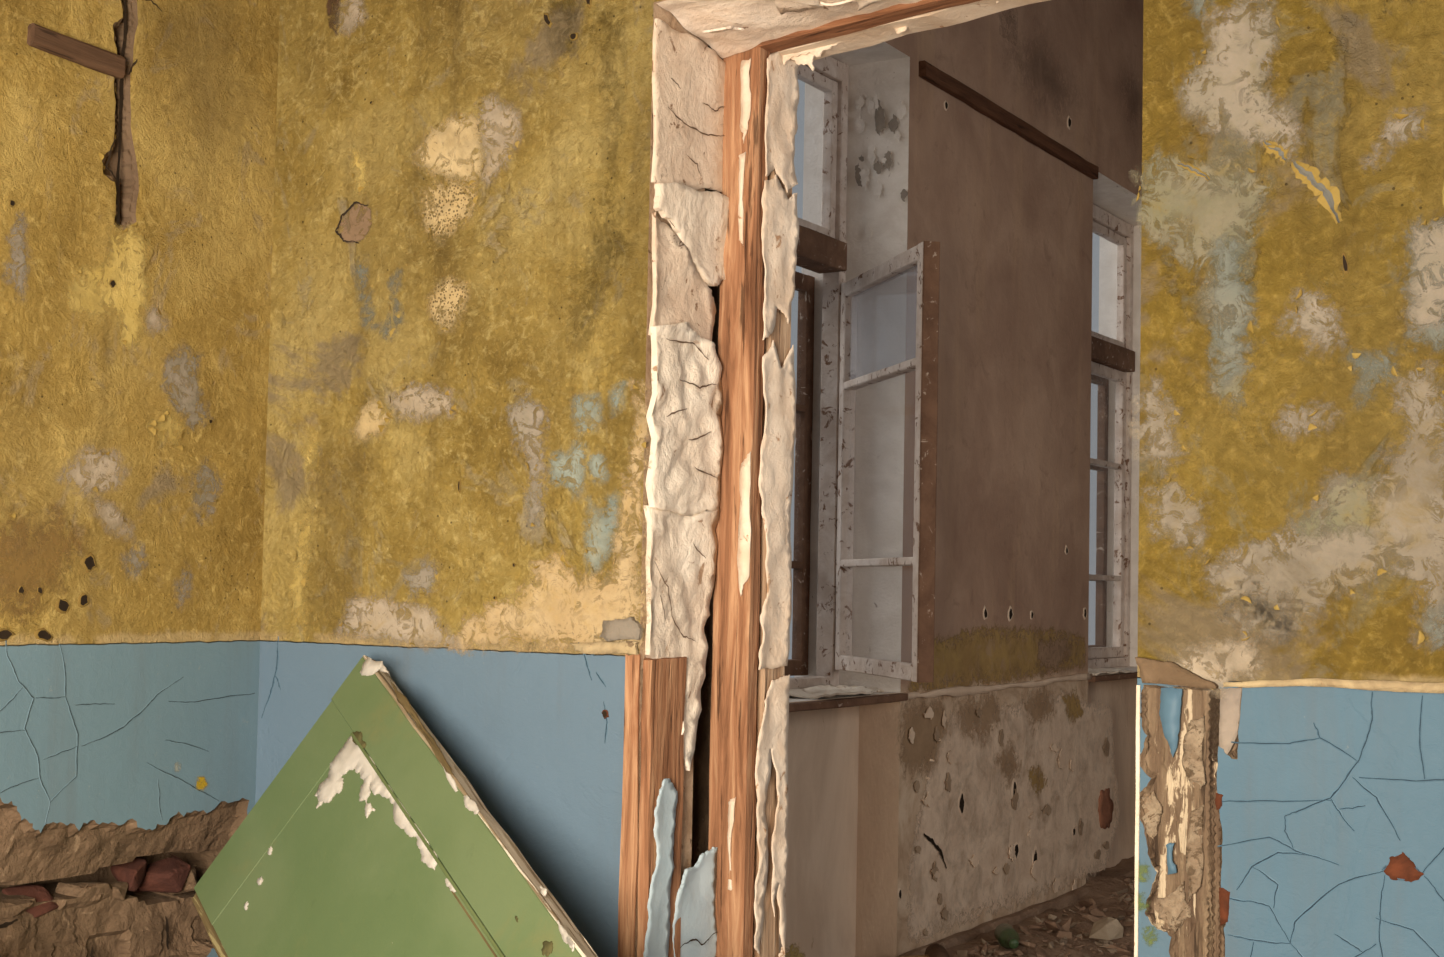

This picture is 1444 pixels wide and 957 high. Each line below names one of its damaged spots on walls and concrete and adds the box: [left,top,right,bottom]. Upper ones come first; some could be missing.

peeling [428,279,468,331]
peeling [417,97,521,235]
peeling [1133,0,1300,403]
peeling [1366,110,1425,165]
peeling [337,322,724,771]
peeling [643,0,921,957]
peeling [1130,182,1444,957]
spalling [0,798,249,957]
crack [0,636,281,825]
peeling [900,625,1120,943]
crack [1217,692,1444,957]